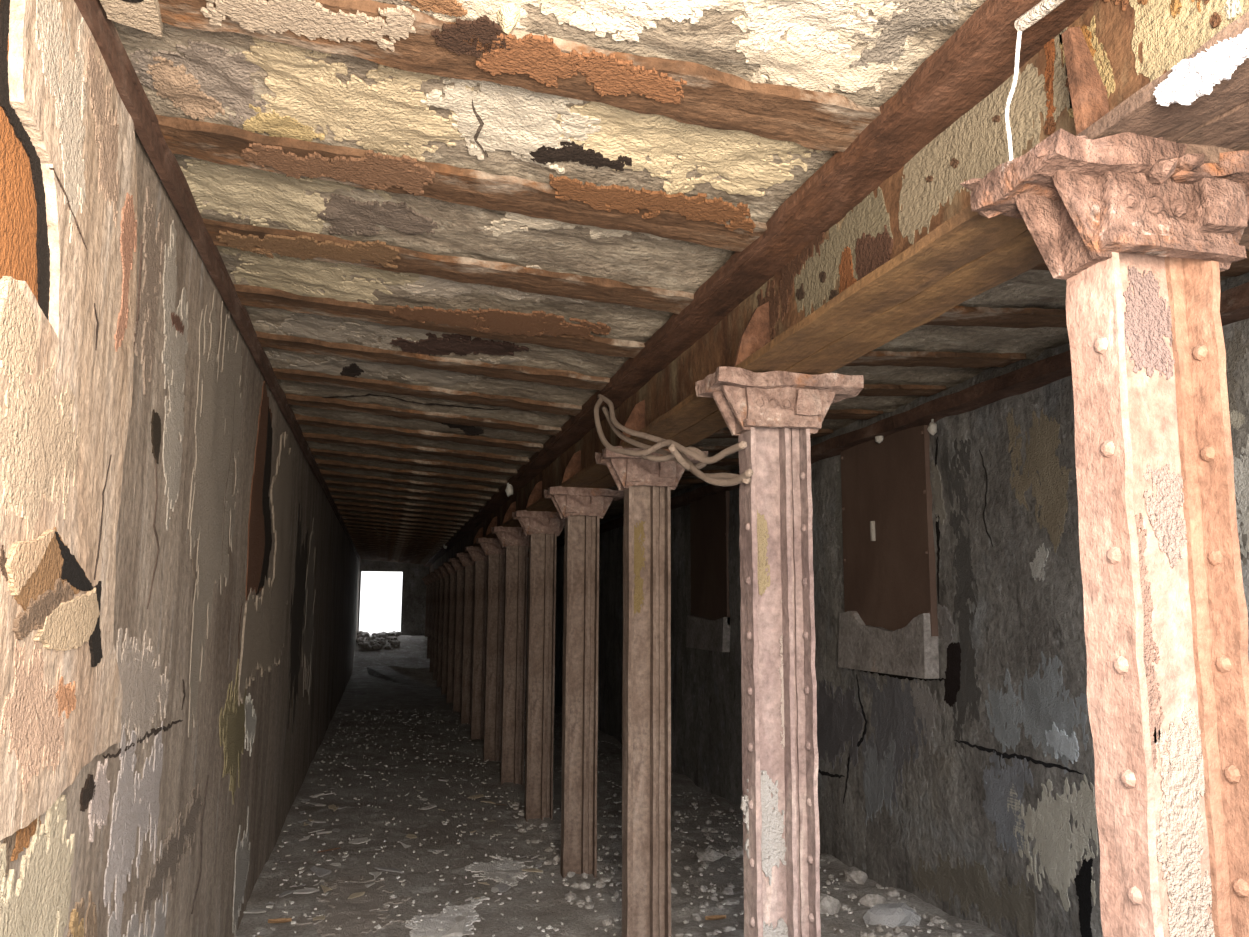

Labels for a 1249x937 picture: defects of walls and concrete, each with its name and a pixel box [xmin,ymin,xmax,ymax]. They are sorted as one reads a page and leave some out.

spalling [403,0,467,17]
peeling [1129,0,1249,82]
water stain [1153,28,1249,106]
water stain [1224,0,1242,20]
hole [530,141,632,171]
peeling [794,27,1074,317]
spalling [318,194,438,236]
spalling [390,333,529,356]
peeling [0,0,137,842]
flaking render [1229,410,1249,558]
crack [103,679,186,759]
crack [818,669,944,804]